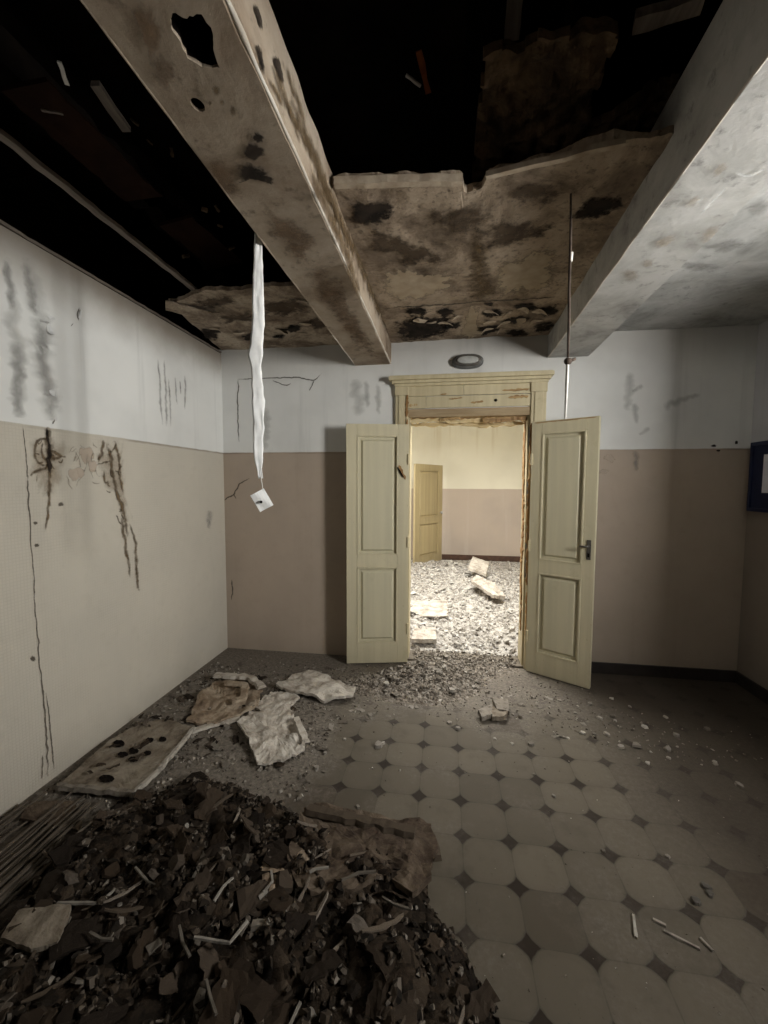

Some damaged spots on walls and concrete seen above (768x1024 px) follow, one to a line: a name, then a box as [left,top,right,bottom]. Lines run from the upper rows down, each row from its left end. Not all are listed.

spalling [171,13,218,65]
spalling [256,45,284,83]
damp [238,133,273,184]
damp [264,69,465,342]
damp [572,197,622,220]
damp [431,207,551,297]
damp [198,296,252,323]
flaking render [381,268,452,300]
flaking render [478,250,558,336]
crack [237,376,319,437]
crack [23,430,54,776]